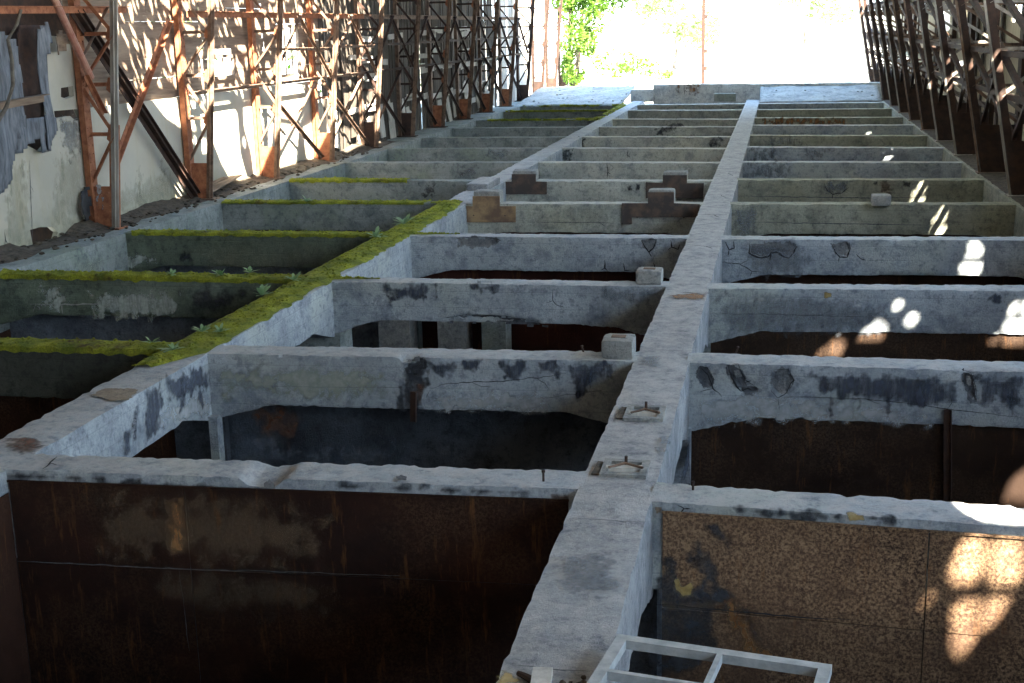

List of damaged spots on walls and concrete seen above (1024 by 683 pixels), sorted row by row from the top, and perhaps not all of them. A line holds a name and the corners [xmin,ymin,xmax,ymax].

crack [642,184,918,276]
spalling [750,241,798,257]
leakage [383,283,437,302]
leakage [125,367,208,455]
leakage [398,360,482,414]
crack [426,373,601,398]
spalling [696,364,758,396]
spalling [770,366,795,394]
leakage [701,372,957,420]
spalling [962,368,977,403]
corrosion [651,541,773,656]
corrosion [649,653,702,677]